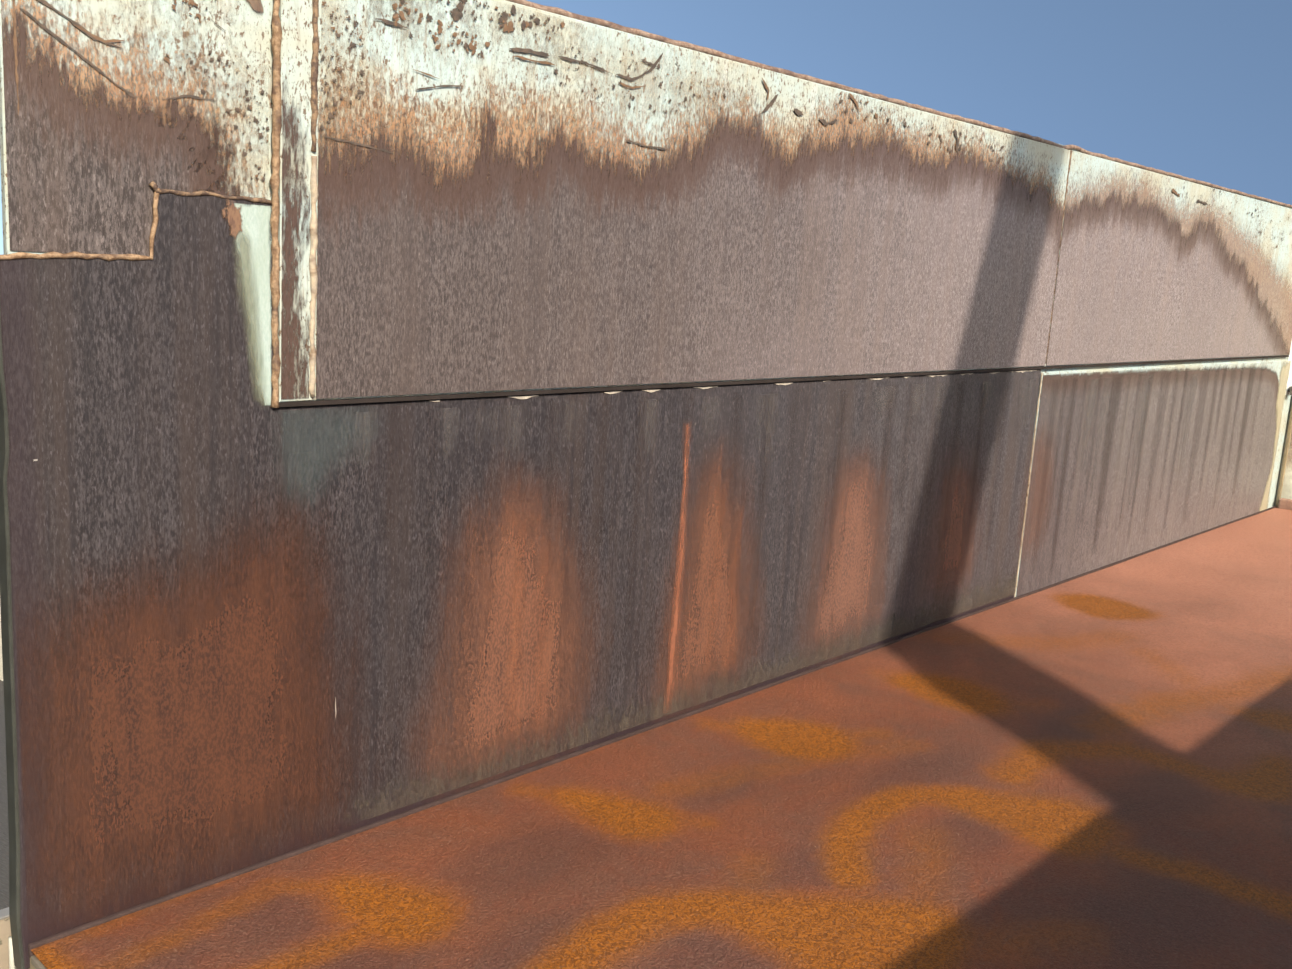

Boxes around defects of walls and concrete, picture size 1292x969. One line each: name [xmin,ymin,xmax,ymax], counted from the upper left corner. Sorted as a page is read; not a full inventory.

corrosion [1,0,263,257]
peeling [172,0,217,23]
peeling [163,51,269,182]
peeling [247,0,264,13]
peeling [319,1,365,130]
peeling [392,0,565,57]
peeling [582,51,734,113]
corrosion [281,67,1292,597]
corrosion [664,426,742,712]
corrosion [815,470,878,647]
corrosion [451,503,580,770]